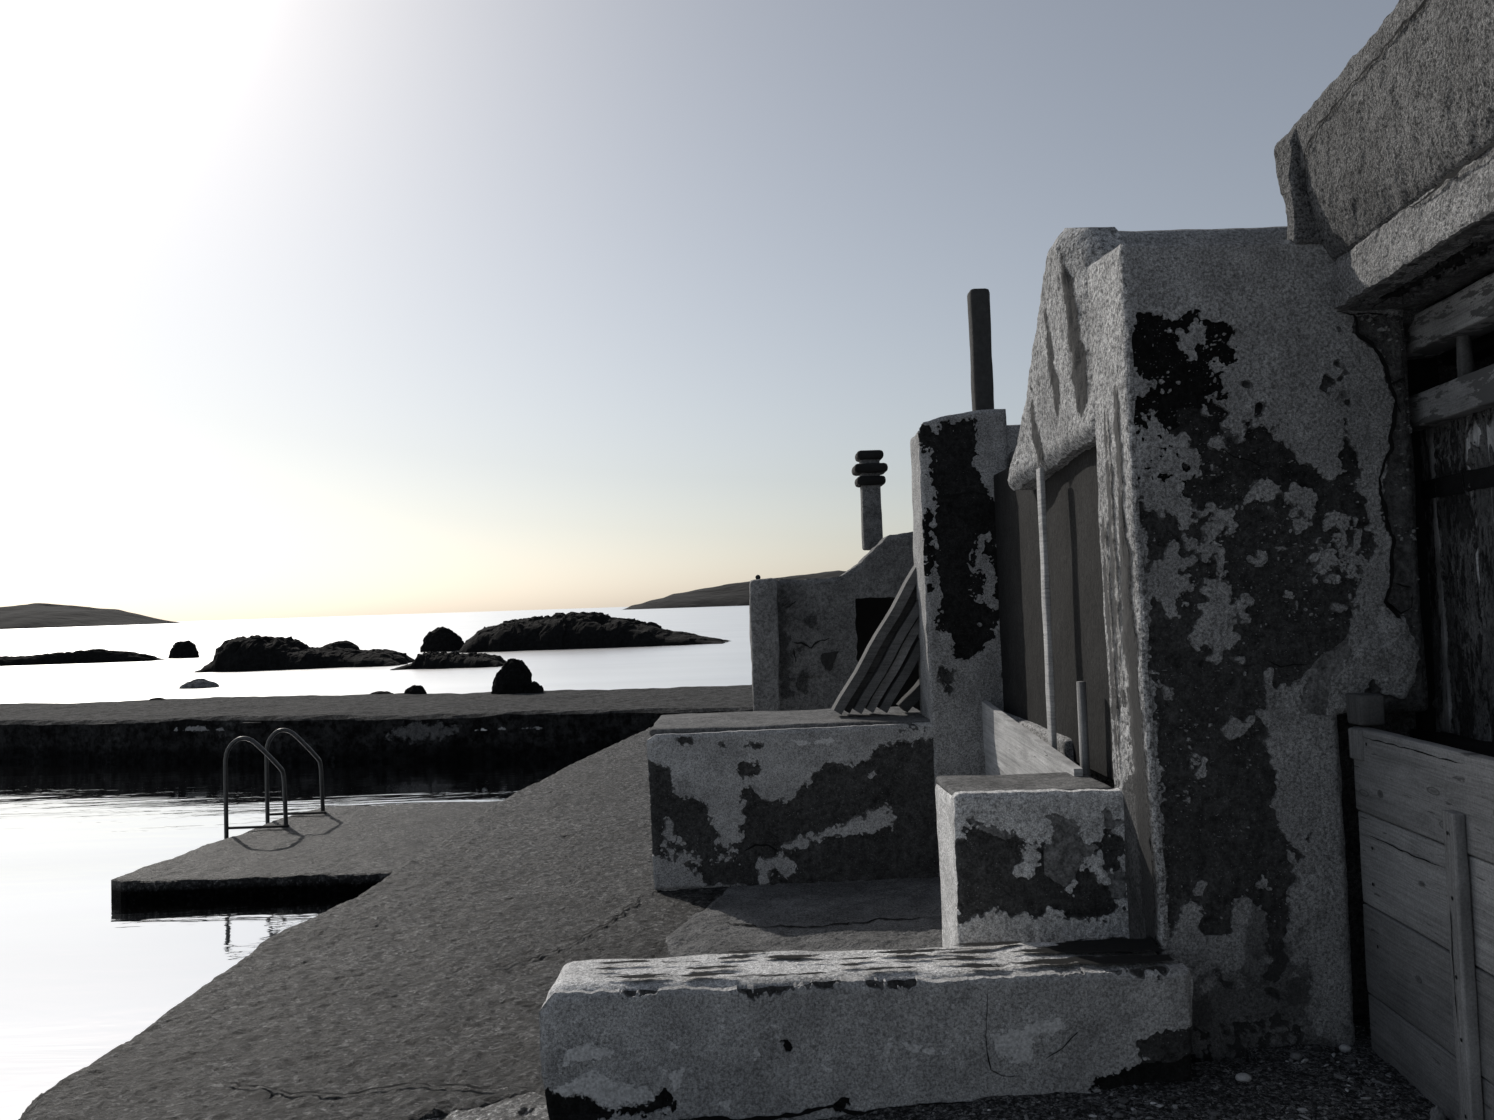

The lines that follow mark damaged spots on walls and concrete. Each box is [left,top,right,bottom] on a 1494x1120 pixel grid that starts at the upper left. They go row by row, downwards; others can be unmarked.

flaking render [917,418,999,696]
flaking render [1089,359,1418,1090]
flaking render [648,725,1126,924]
spalling [620,989,658,999]
spalling [738,980,841,1001]
spalling [865,975,917,990]